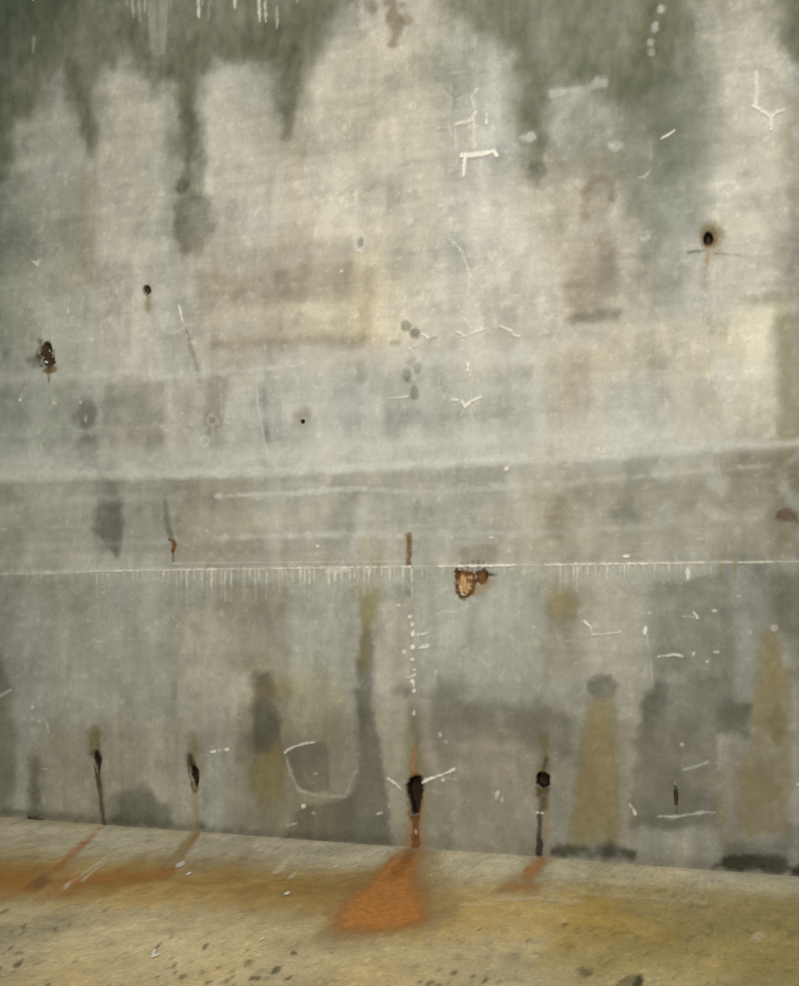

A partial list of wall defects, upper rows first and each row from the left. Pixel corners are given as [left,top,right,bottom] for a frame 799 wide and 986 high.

rust [331,851,441,932]